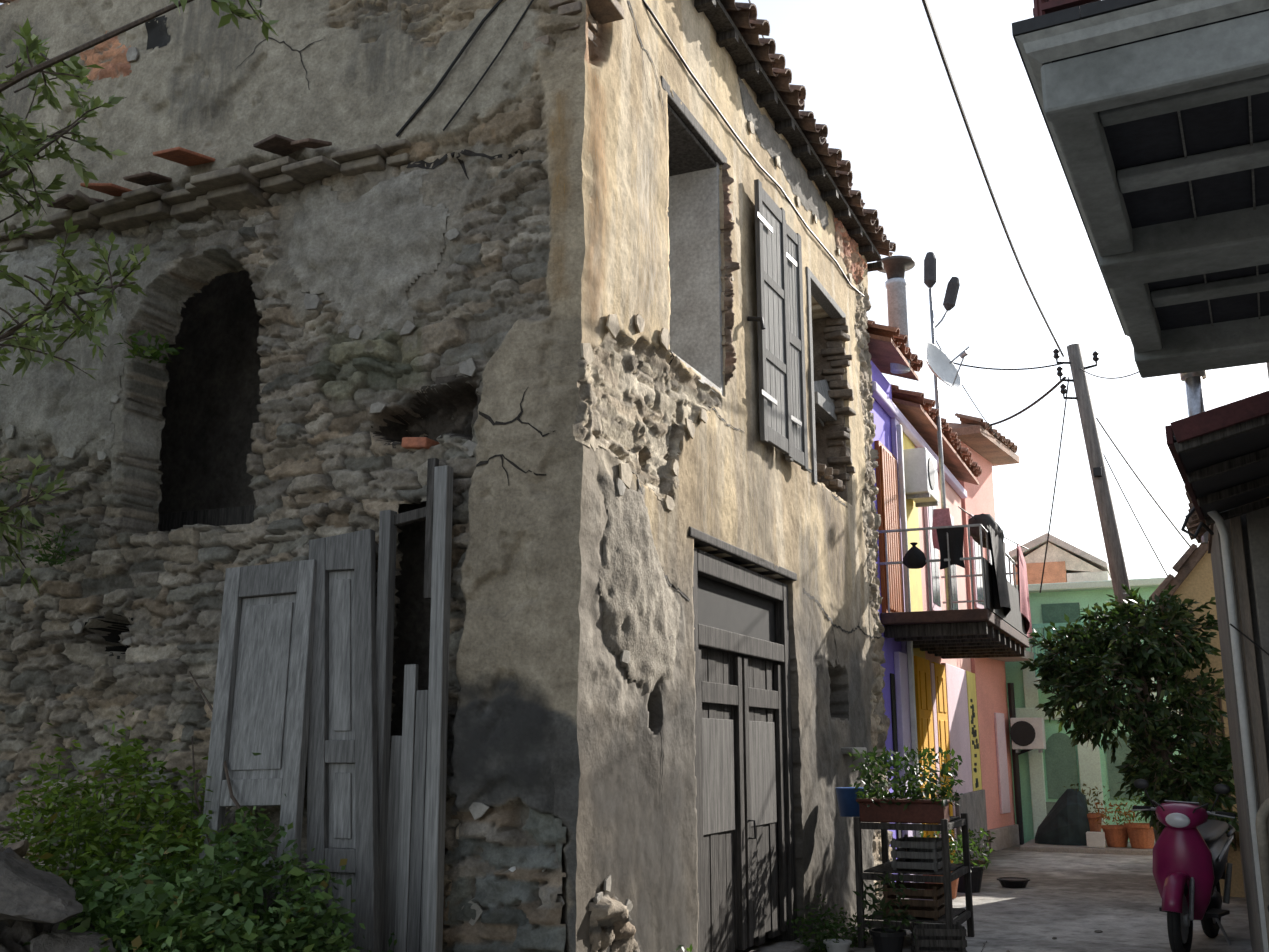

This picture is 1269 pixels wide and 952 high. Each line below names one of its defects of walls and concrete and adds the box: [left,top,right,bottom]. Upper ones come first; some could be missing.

flaking render [75,15,171,89]
peeling [287,169,460,340]
peeling [0,237,132,460]
flaking render [573,162,740,511]
flaking render [370,358,481,457]
crack [476,388,556,486]
hole [72,612,133,659]
crack [803,588,880,658]
flaking render [443,797,566,952]
flaking render [589,875,641,952]